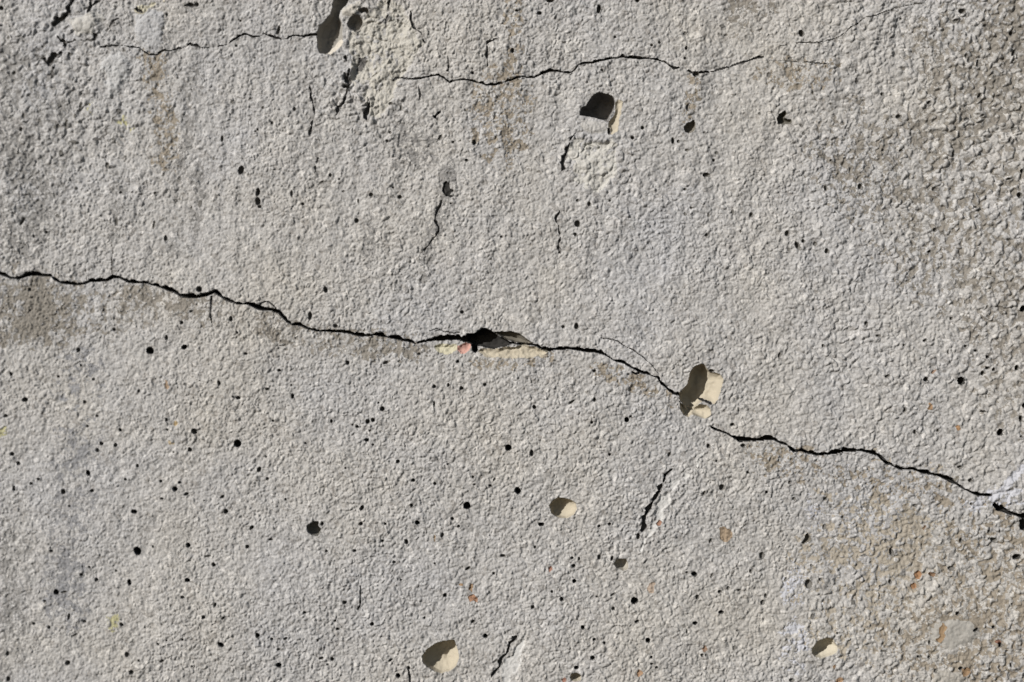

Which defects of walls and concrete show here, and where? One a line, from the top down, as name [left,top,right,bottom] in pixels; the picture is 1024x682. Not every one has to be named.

crack [41,0,318,79]
spalling [317,0,424,118]
crack [392,3,922,101]
spalling [566,92,623,193]
spalling [434,343,457,355]
spalling [478,331,548,358]
crack [0,244,1024,518]
hole [679,364,724,419]
hole [549,497,577,518]
crack [640,469,672,532]
hole [422,640,459,673]
hole [812,638,838,659]